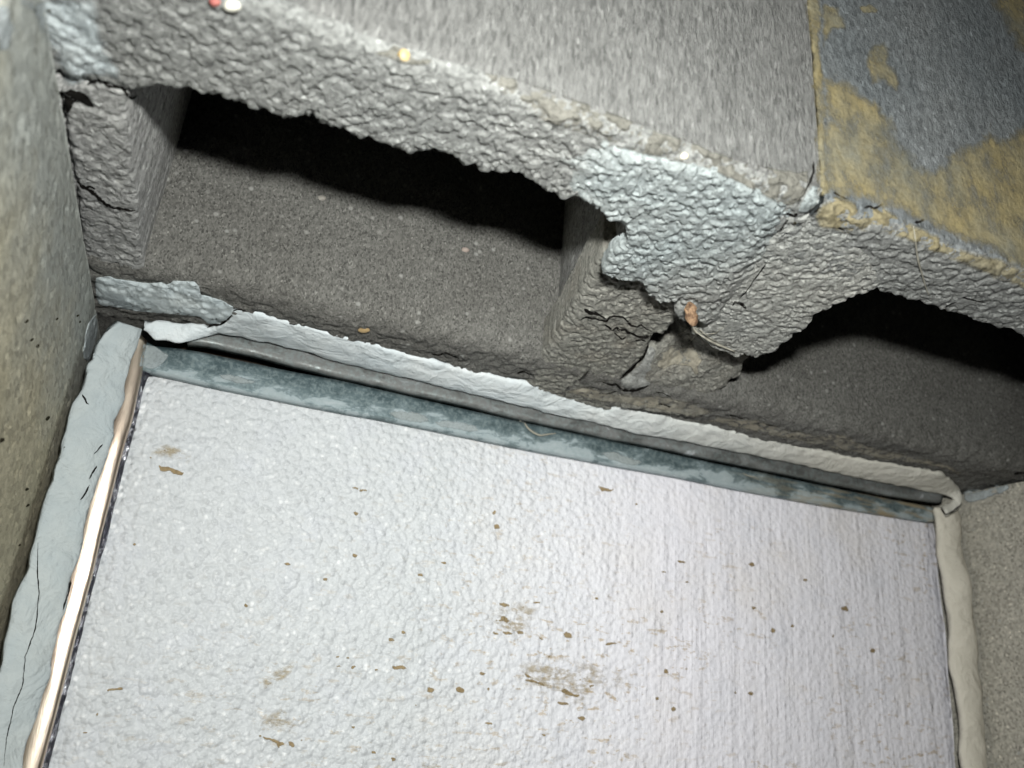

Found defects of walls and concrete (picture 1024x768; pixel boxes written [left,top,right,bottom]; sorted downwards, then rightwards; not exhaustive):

water stain [806,0,1024,267]
crack [581,309,671,408]